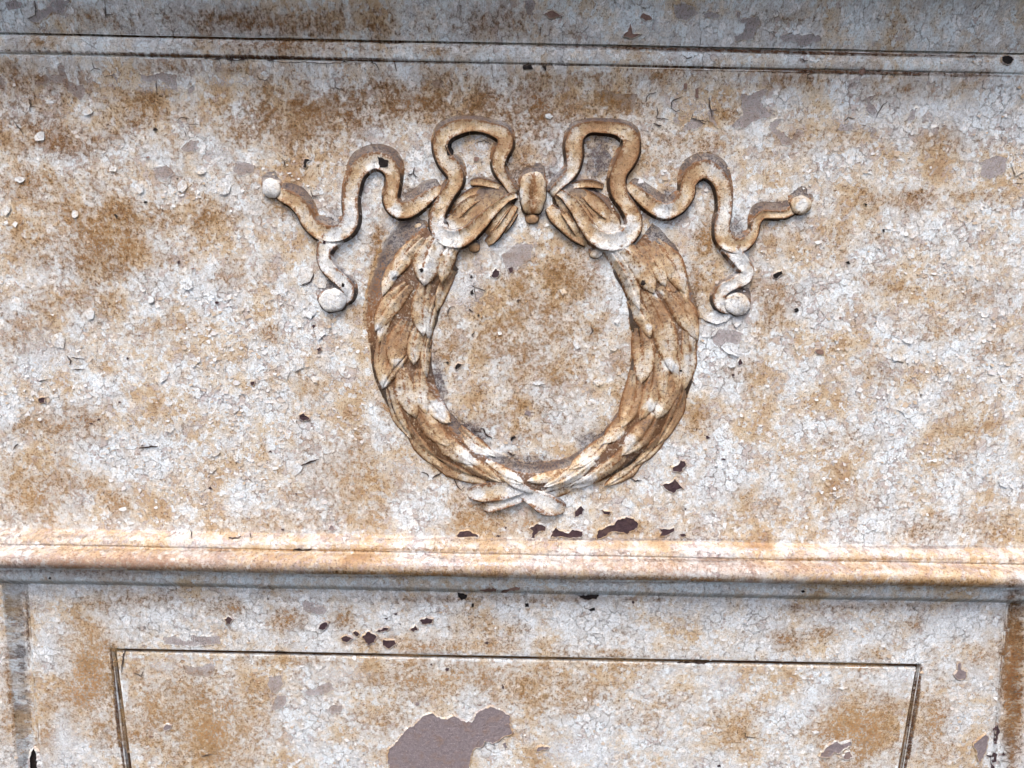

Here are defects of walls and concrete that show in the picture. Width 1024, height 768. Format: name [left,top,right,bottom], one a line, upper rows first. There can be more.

peeling [622,11,654,40]
water stain [561,64,998,76]
crack [646,92,717,127]
peeling [660,458,687,494]
peeling [455,528,480,540]
peeling [528,504,639,540]
peeling [659,526,686,537]
peeling [340,613,434,649]
water stain [110,646,127,768]
peeling [386,702,514,768]
peeling [818,739,854,761]
water stain [902,667,922,768]